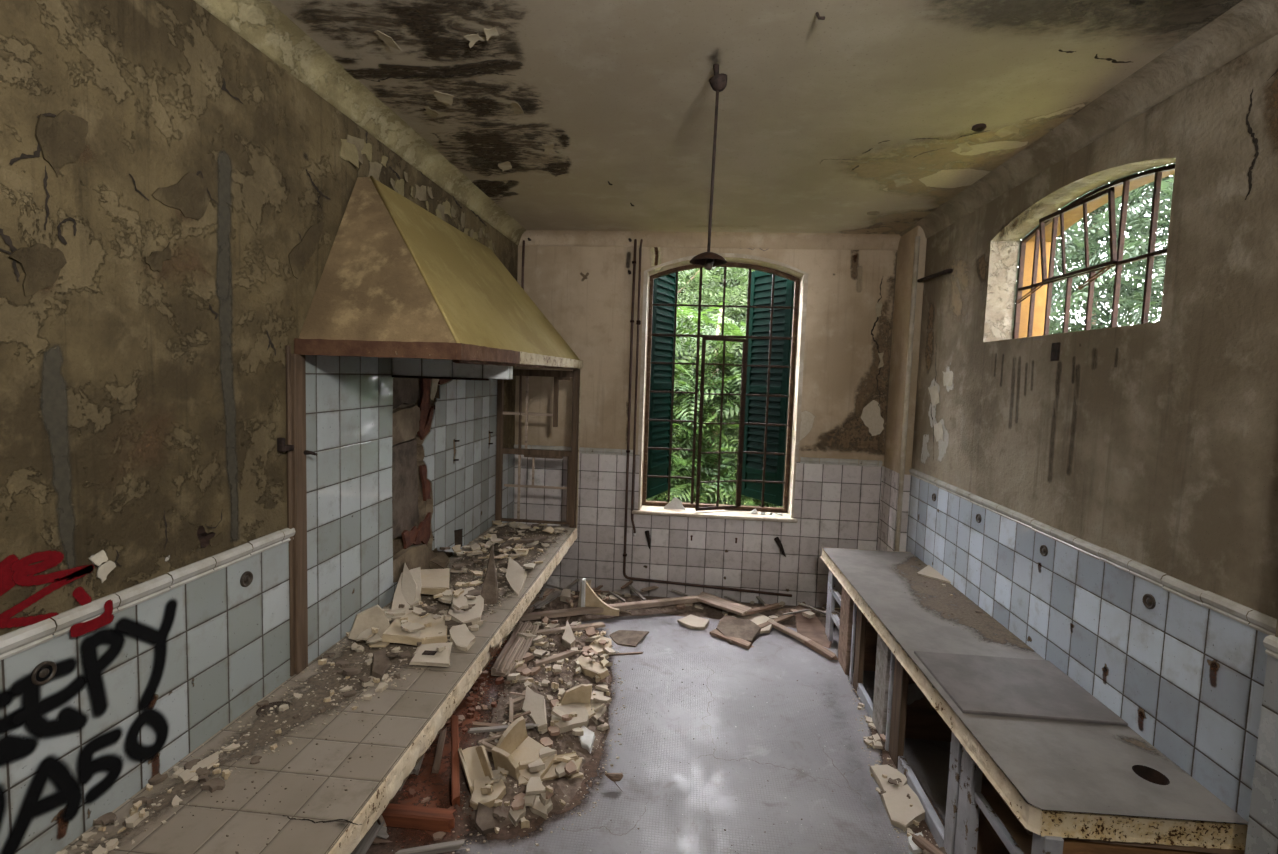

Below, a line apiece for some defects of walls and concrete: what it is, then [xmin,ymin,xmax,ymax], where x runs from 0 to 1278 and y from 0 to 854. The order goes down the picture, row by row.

water stain [297,0,571,200]
flaking render [392,377,462,582]